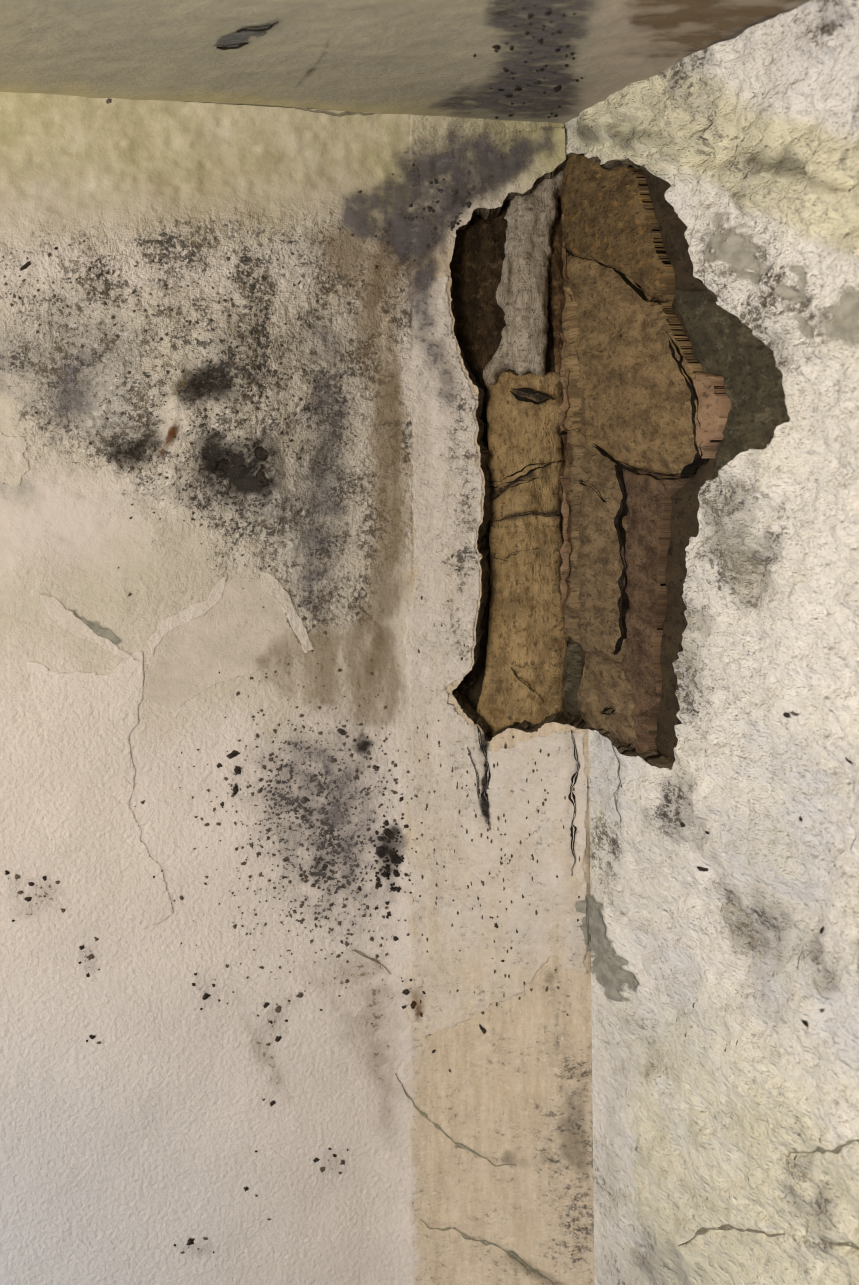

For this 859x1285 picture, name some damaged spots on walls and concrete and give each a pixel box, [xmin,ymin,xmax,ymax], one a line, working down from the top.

water stain [4,0,590,1084]
spalling [396,153,859,1041]
crack [396,1074,516,1166]
crack [789,1139,859,1154]
crack [421,1220,555,1285]
crack [678,1224,785,1246]
crack [821,1239,859,1250]